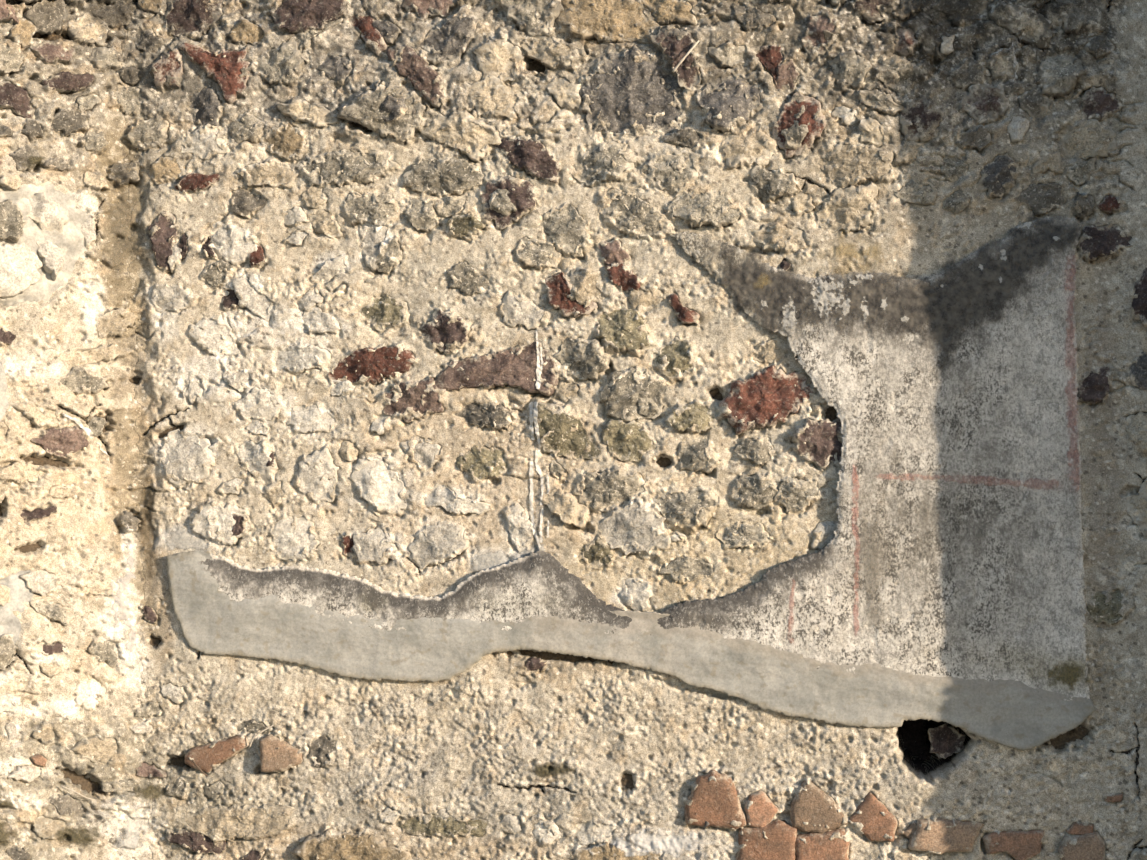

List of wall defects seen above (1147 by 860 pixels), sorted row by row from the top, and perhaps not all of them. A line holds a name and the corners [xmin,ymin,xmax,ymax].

damp [723,218,1078,369]
peeling [166,216,1096,751]
crack [498,784,577,793]
crack [1110,723,1140,798]